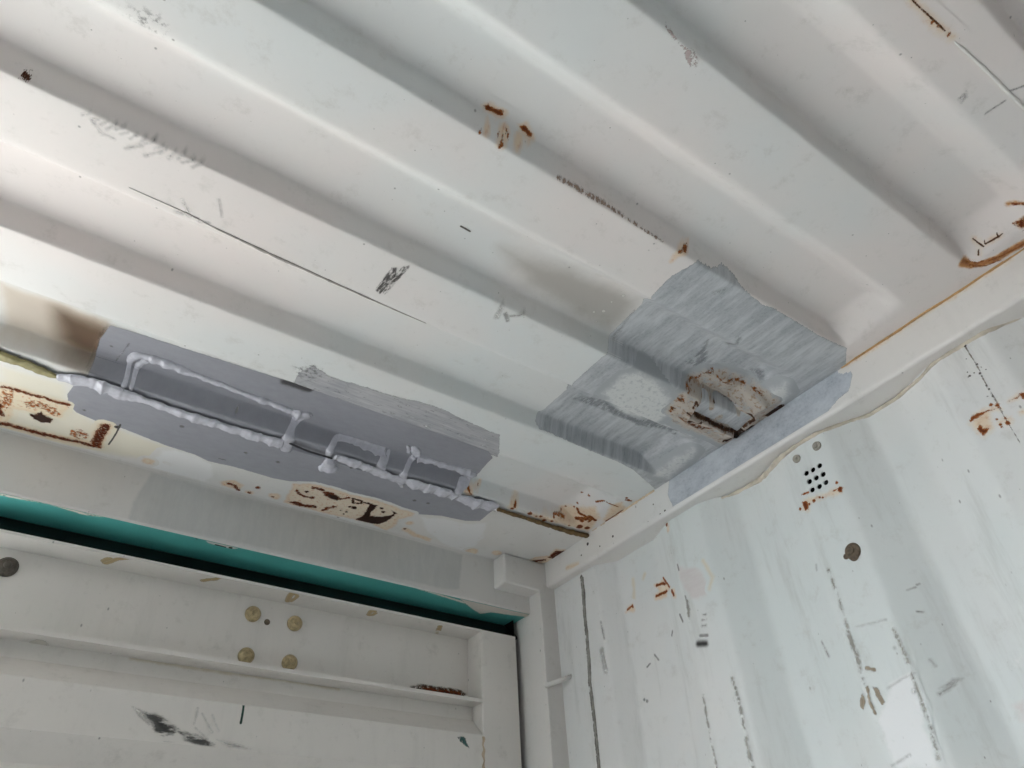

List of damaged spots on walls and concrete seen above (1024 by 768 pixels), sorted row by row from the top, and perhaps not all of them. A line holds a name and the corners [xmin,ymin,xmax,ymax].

corrosion [897,0,968,51]
corrosion [475,94,541,161]
corrosion [838,197,1024,374]
water stain [0,280,169,463]
corrosion [0,382,117,451]
corrosion [661,363,784,448]
corrosion [961,385,1024,444]
corrosion [215,477,435,543]
corrosion [503,488,632,533]
corrosion [797,481,851,517]
corrosion [652,576,678,604]
corrosion [410,685,465,696]